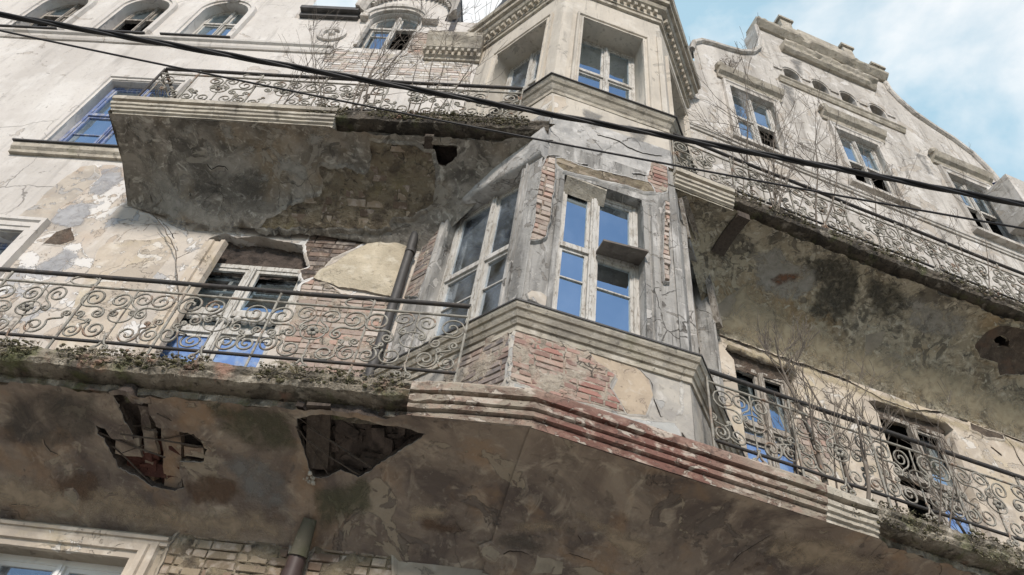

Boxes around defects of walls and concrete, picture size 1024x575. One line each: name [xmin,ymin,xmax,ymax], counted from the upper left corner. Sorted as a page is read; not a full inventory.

peeling [19,165,123,271]
spalling [210,137,440,377]
spalling [443,331,687,438]
leakage [722,248,1024,450]
spalling [970,322,1024,379]
leakage [0,472,99,513]
leakage [114,460,282,540]